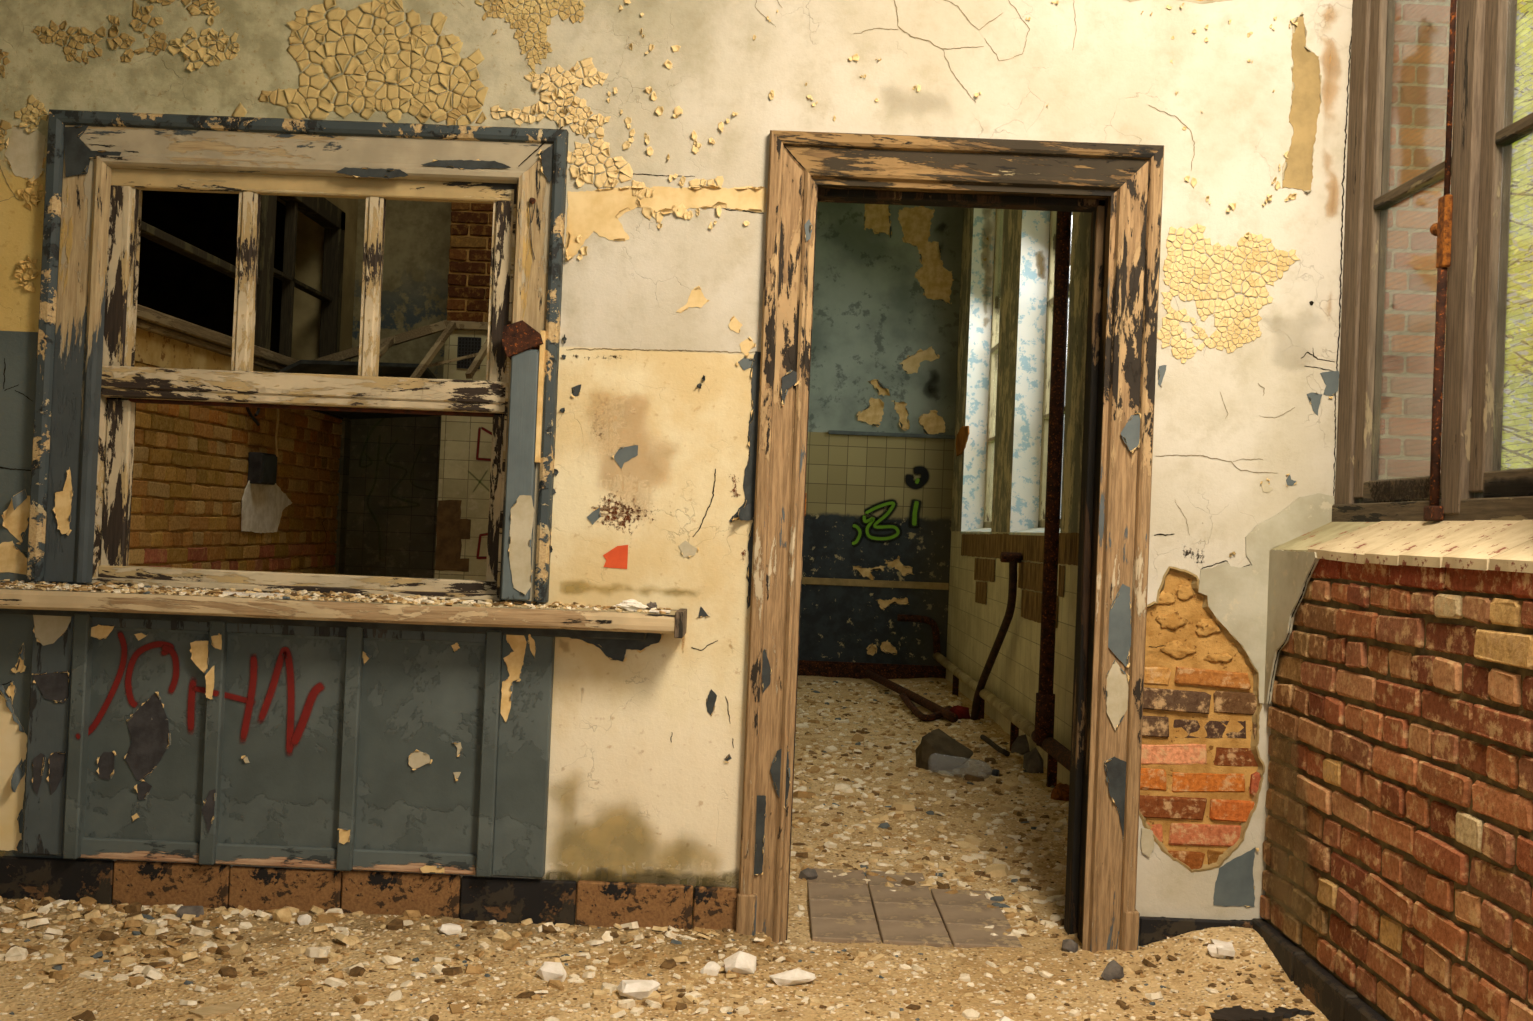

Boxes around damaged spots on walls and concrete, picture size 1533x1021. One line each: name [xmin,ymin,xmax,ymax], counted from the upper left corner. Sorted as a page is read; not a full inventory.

peeling [33,0,240,72]
crack [854,0,1030,102]
peeling [232,0,767,262]
crack [1149,105,1195,170]
flaking render [1247,12,1322,206]
peeling [864,204,954,305]
peeling [1157,224,1300,364]
peeling [900,346,940,374]
peeling [91,624,114,640]
peeling [0,615,71,852]
spalling [1104,566,1265,873]
water stain [537,812,739,927]